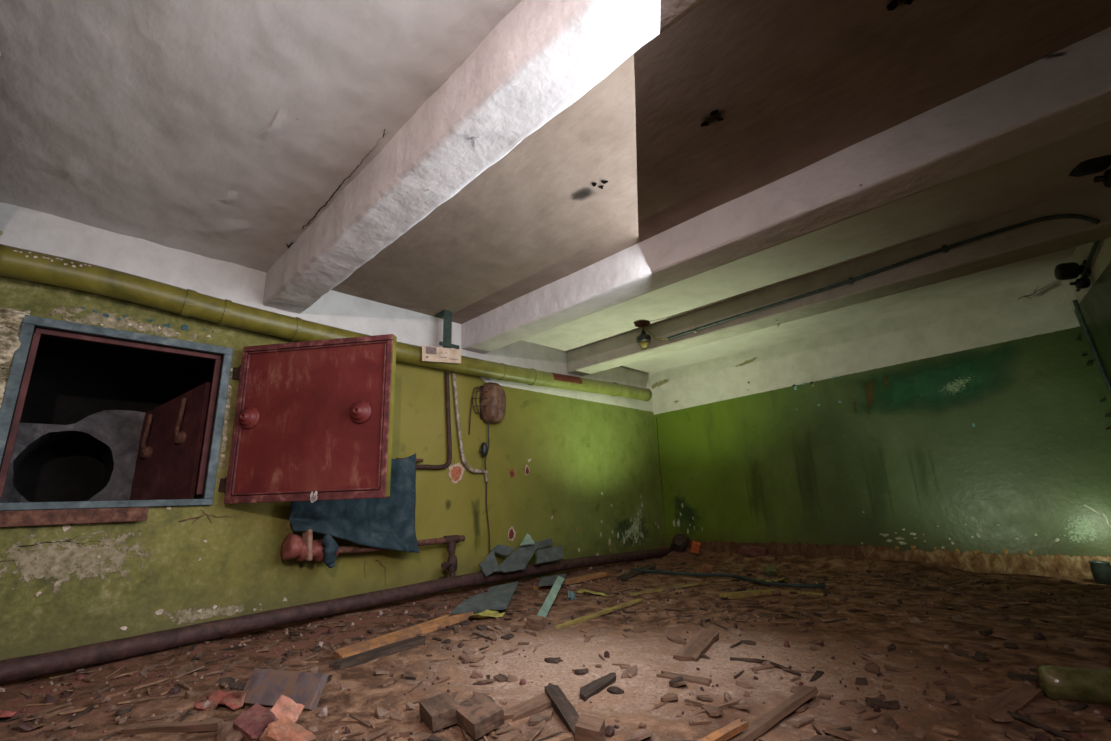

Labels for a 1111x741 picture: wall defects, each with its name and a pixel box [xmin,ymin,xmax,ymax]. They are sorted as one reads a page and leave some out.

peeling [0,523,155,597]
spalling [686,524,1111,579]